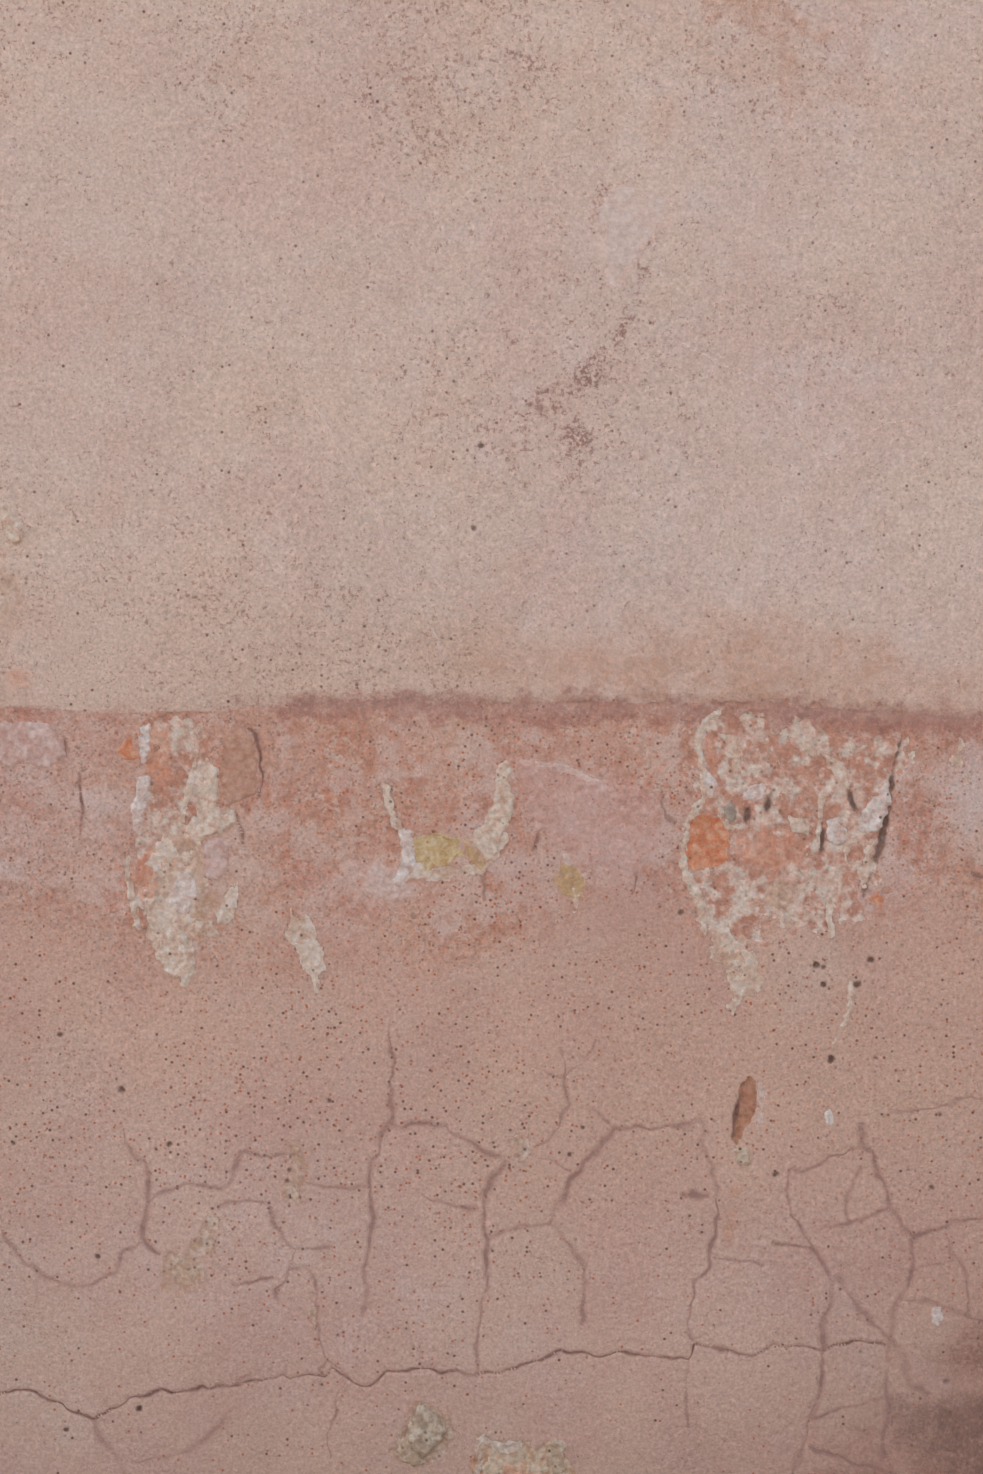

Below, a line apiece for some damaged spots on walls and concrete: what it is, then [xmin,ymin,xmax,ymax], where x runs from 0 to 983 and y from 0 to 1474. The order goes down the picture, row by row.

peeling [118,716,239,989]
peeling [366,760,515,900]
peeling [678,698,925,1017]
crack [141,1179,168,1253]
crack [368,1043,429,1248]
crack [463,1144,506,1286]
crack [565,1125,679,1194]
crack [690,1202,719,1307]
crack [0,1379,266,1420]
peeling [469,1434,575,1474]
crack [301,1303,762,1387]
crack [812,1314,890,1467]